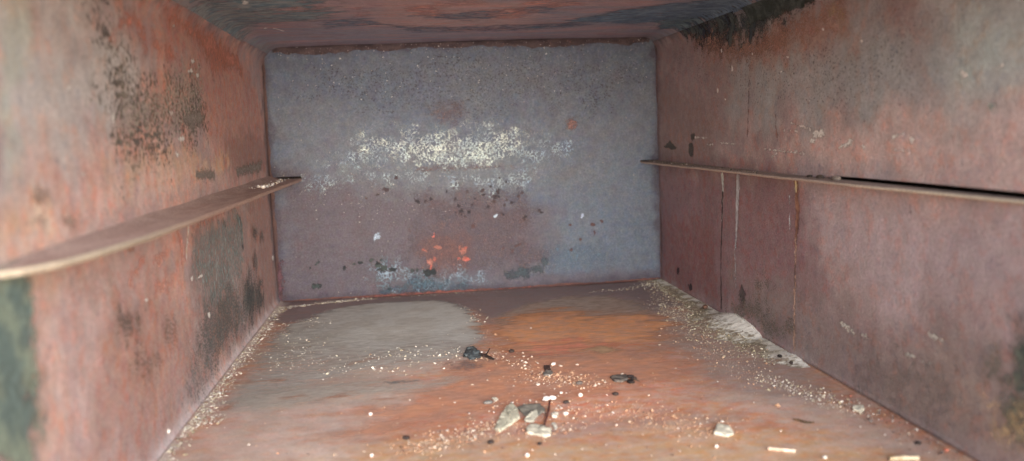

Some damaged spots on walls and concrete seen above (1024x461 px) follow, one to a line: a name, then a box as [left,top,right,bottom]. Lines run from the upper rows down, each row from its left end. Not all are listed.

damp [190,0,816,55]
damp [300,120,576,197]
damp [186,226,265,403]
corrosion [339,307,684,437]